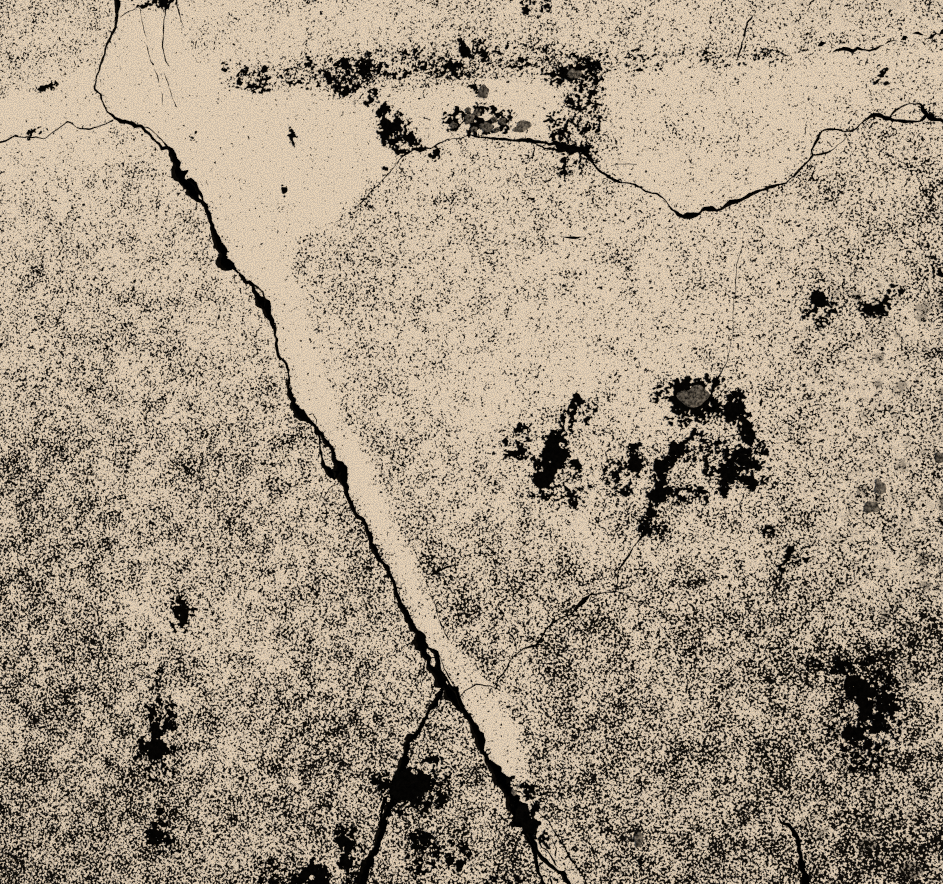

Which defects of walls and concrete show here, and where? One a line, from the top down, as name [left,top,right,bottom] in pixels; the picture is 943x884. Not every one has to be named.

crack [736,15,753,61]
crack [356,103,943,219]
crack [711,250,742,394]
crack [0,0,647,884]
crack [778,817,809,884]